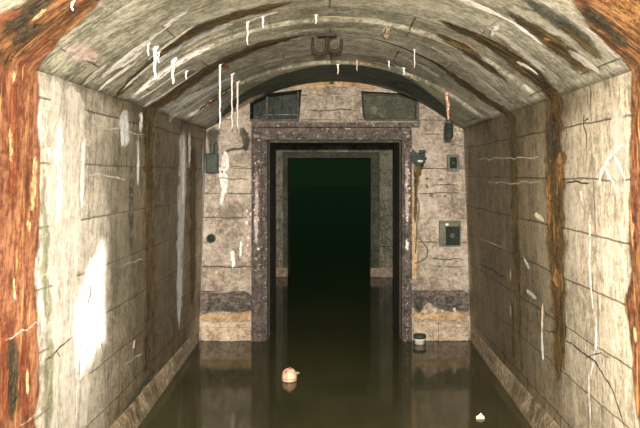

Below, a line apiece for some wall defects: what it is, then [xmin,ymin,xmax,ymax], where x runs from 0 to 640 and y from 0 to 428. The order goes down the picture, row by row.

efflorescence [120,113,128,146]
efflorescence [84,13,186,90]
efflorescence [124,23,232,132]
corrosion [509,13,590,73]
corrosion [0,0,99,428]
damp [41,77,106,428]
damp [177,128,251,322]
corrosion [412,164,433,279]
spalling [412,290,470,314]
corrosion [432,22,567,379]
corrosion [573,0,640,424]
crack [546,330,624,425]